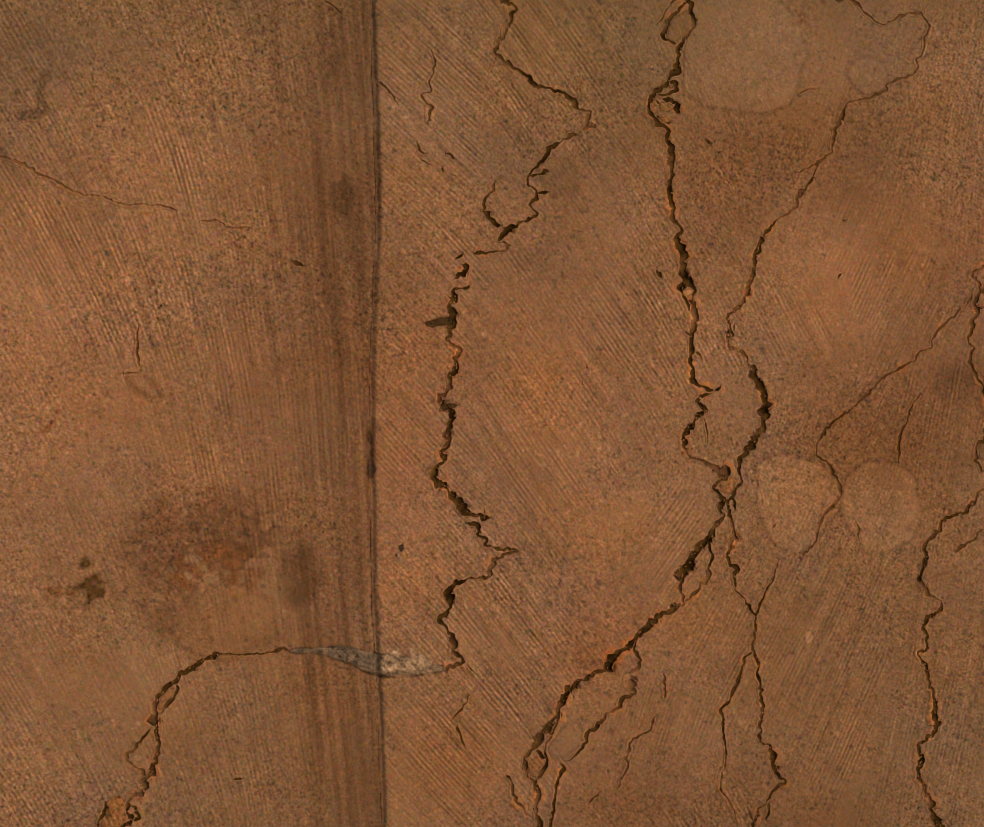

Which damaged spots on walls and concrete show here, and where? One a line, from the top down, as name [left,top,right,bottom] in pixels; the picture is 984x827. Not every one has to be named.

crack [376,49,456,179]
crack [0,153,177,213]
crack [199,216,251,231]
crack [123,326,144,377]
crack [425,0,598,746]
crack [504,0,984,827]
water stain [176,581,276,660]
crack [94,644,289,827]